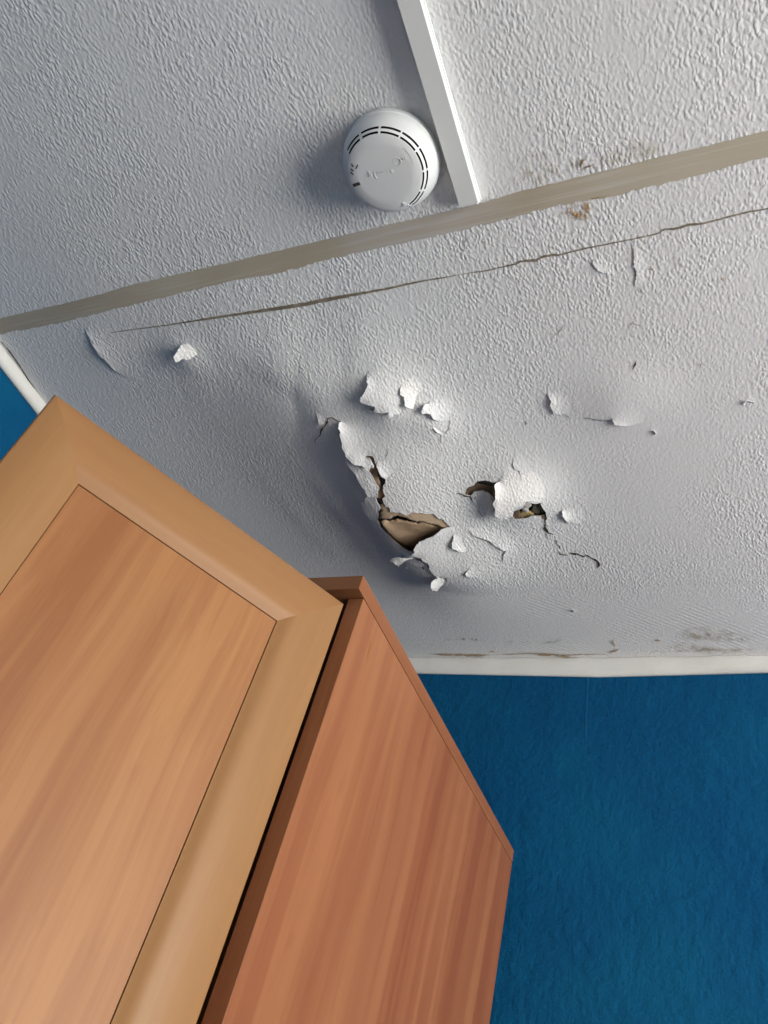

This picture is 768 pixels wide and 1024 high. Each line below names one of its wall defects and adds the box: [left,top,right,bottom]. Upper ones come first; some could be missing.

peeling [85,324,144,383]
peeling [173,344,197,362]
peeling [360,362,452,434]
peeling [547,390,571,415]
peeling [583,396,656,435]
peeling [338,418,393,520]
peeling [390,453,546,591]
crack [544,520,600,569]
peeling [562,507,586,524]